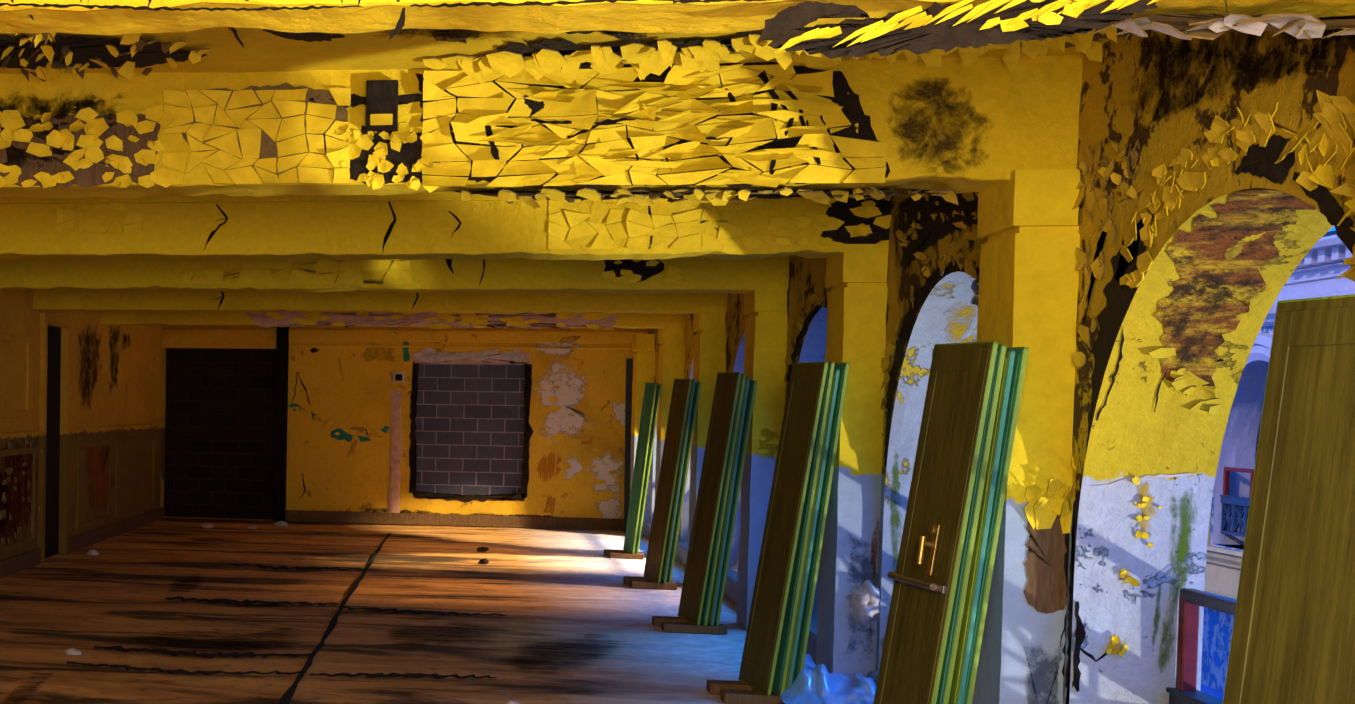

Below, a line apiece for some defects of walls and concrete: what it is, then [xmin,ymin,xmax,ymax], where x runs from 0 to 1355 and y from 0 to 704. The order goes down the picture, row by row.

crack [0,0,362,48]
crack [389,0,769,39]
water stain [1131,29,1355,119]
crack [204,204,228,250]
crack [383,201,397,264]
crack [446,211,485,285]
peeling [0,0,1355,467]
peeling [245,310,625,519]
crack [66,534,508,704]
spalling [1024,491,1080,704]
peeling [1106,634,1129,657]
peeling [1119,568,1141,587]